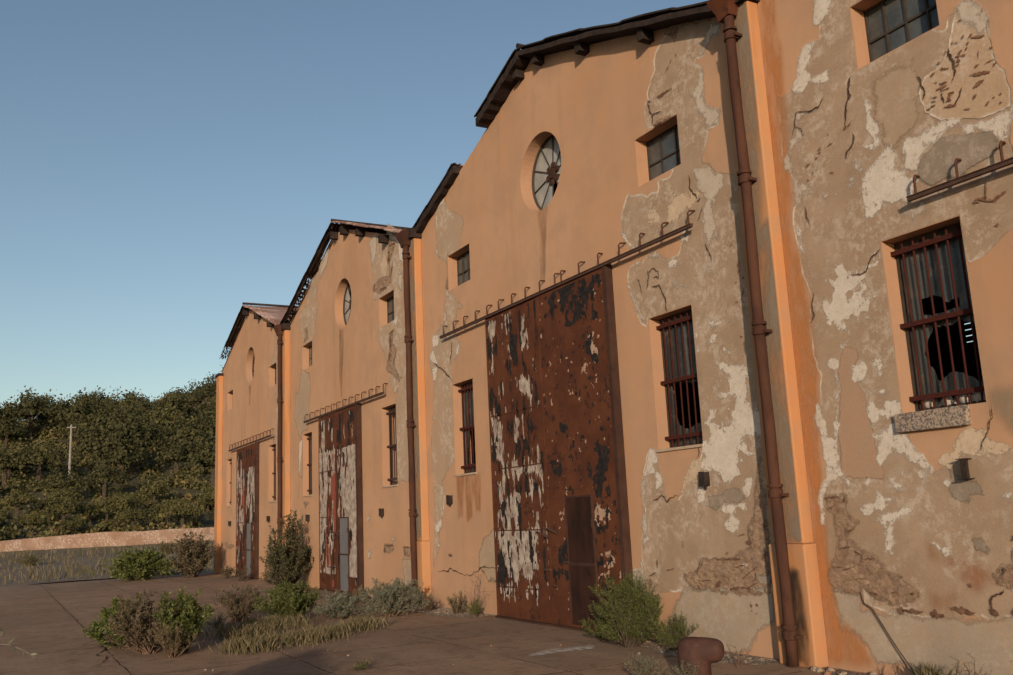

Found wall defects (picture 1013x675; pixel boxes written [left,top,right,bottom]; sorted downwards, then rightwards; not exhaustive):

peeling [369,223,409,482]
peeling [429,277,463,568]
peeling [435,199,464,262]
peeling [549,331,609,395]
peeling [594,503,611,527]
peeling [598,18,775,653]
peeling [776,0,1013,675]